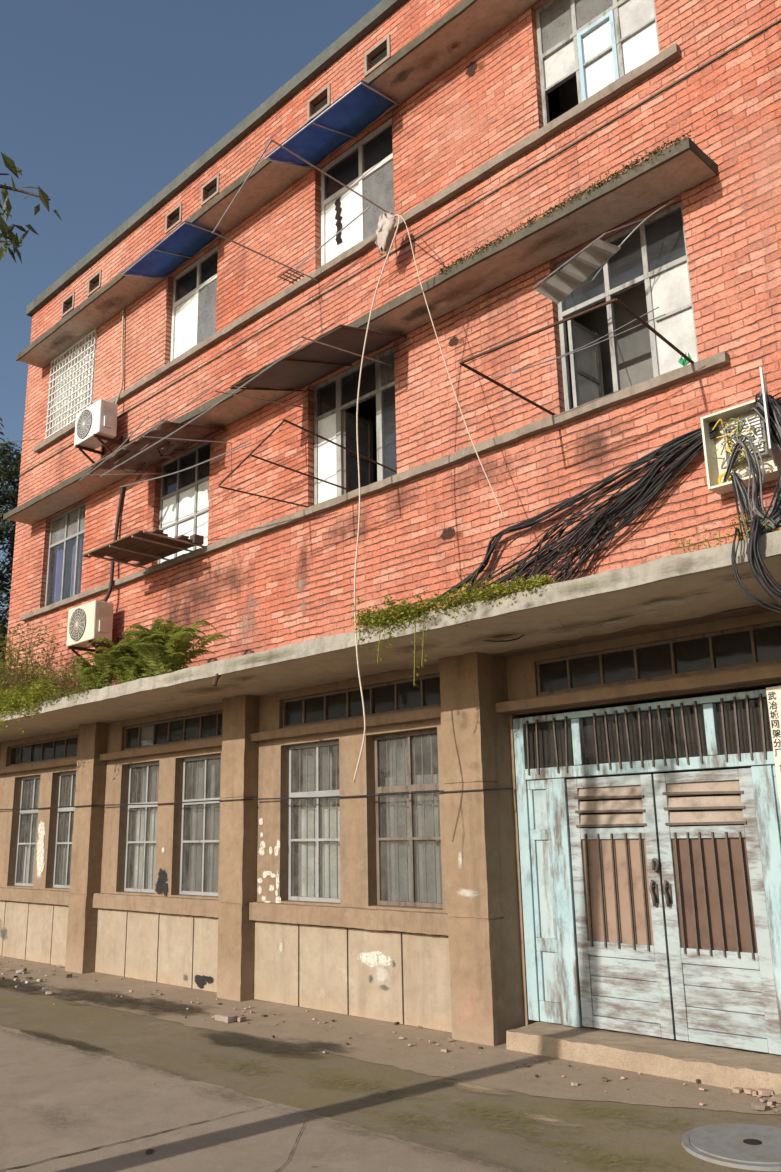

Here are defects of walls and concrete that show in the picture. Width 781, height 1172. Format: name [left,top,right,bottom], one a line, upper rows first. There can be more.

peeling [259,818,280,856]
peeling [257,870,281,903]